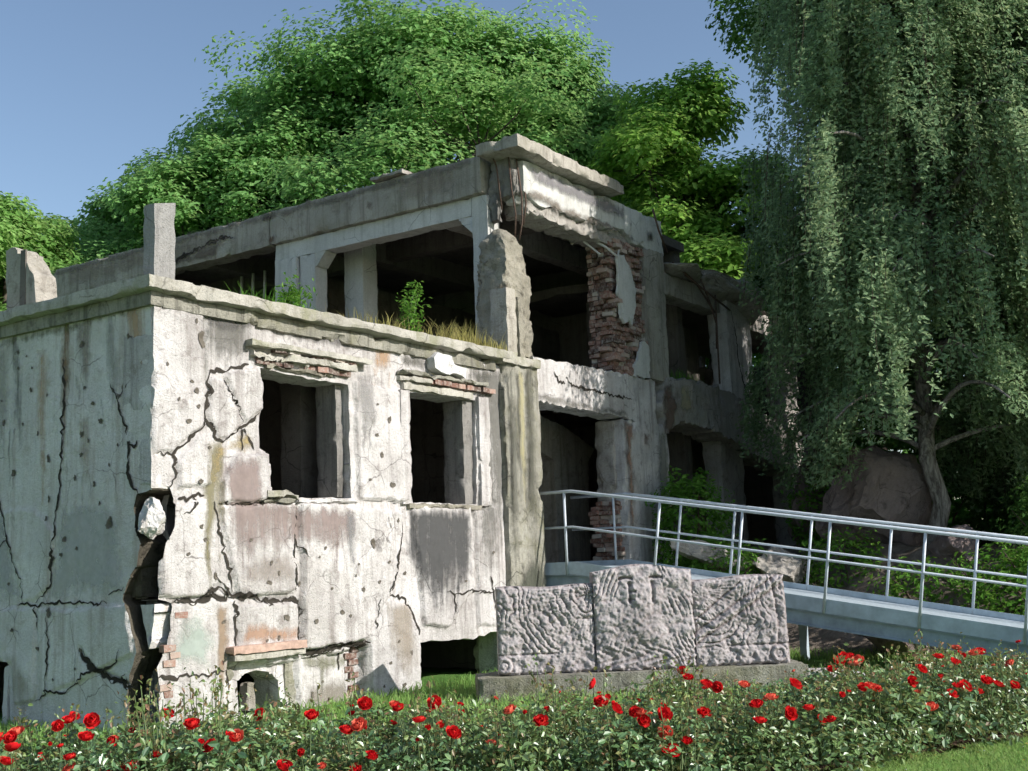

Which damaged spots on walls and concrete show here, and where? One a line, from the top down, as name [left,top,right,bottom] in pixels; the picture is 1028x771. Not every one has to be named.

flaking render [615,254,636,326]
crack [554,371,632,400]
flaking render [632,341,650,379]
crack [0,360,420,701]